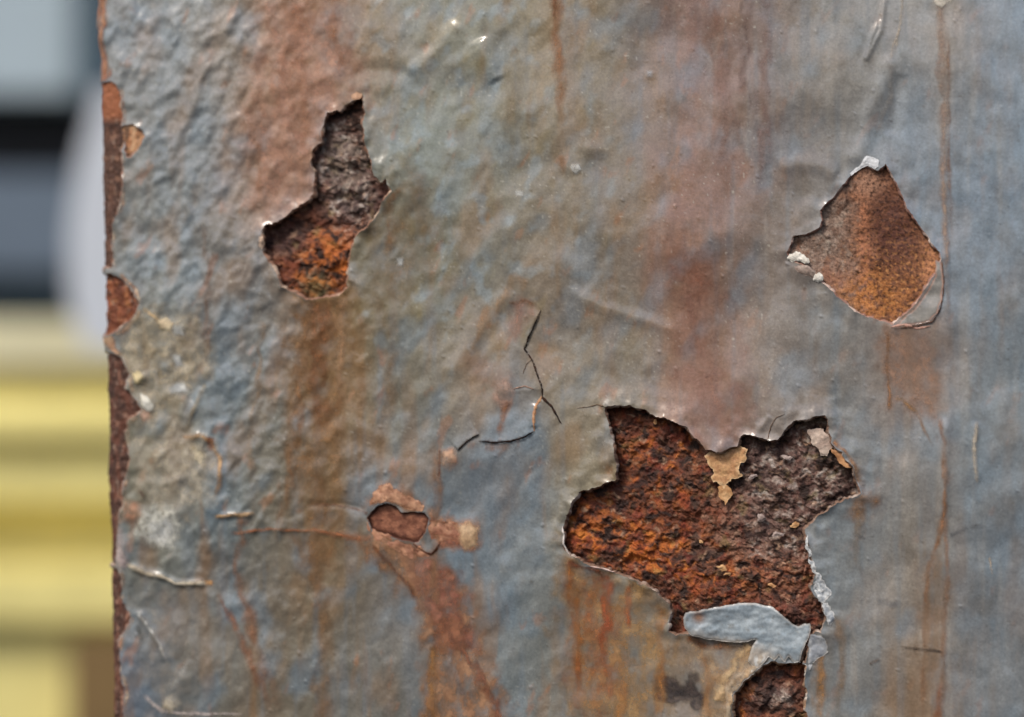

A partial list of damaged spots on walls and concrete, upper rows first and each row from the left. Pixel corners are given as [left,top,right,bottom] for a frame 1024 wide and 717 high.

peeling [259,92,392,300]
peeling [786,156,943,325]
peeling [101,80,222,717]
corrosion [333,534,507,717]
peeling [367,483,478,559]
corrosion [434,449,457,490]
corrosion [429,512,478,550]
crack [458,311,603,450]
peeling [561,405,861,717]